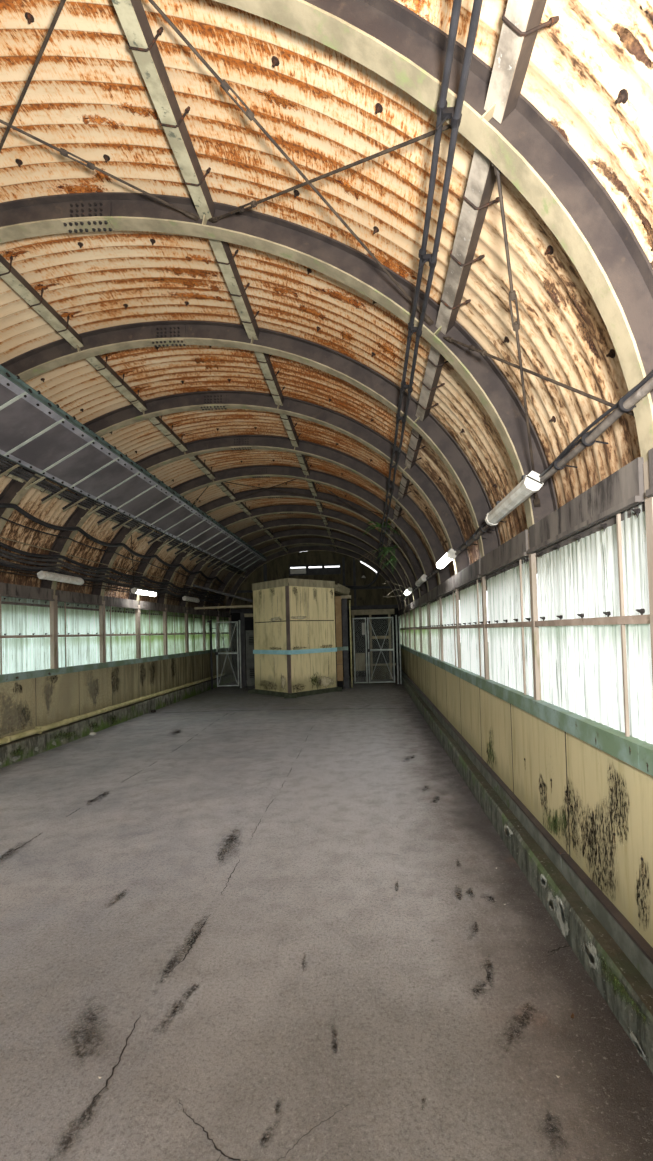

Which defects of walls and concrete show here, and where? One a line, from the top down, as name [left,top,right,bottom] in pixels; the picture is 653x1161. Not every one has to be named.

corrosion [614,23,653,69]
corrosion [82,103,158,129]
corrosion [258,90,298,110]
corrosion [336,178,364,199]
corrosion [589,159,653,246]
corrosion [148,254,226,302]
corrosion [544,281,598,358]
leakage [0,684,32,736]
leakage [539,766,629,896]
leakage [636,863,650,926]
crack [88,1016,141,1108]
crack [179,1099,247,1161]